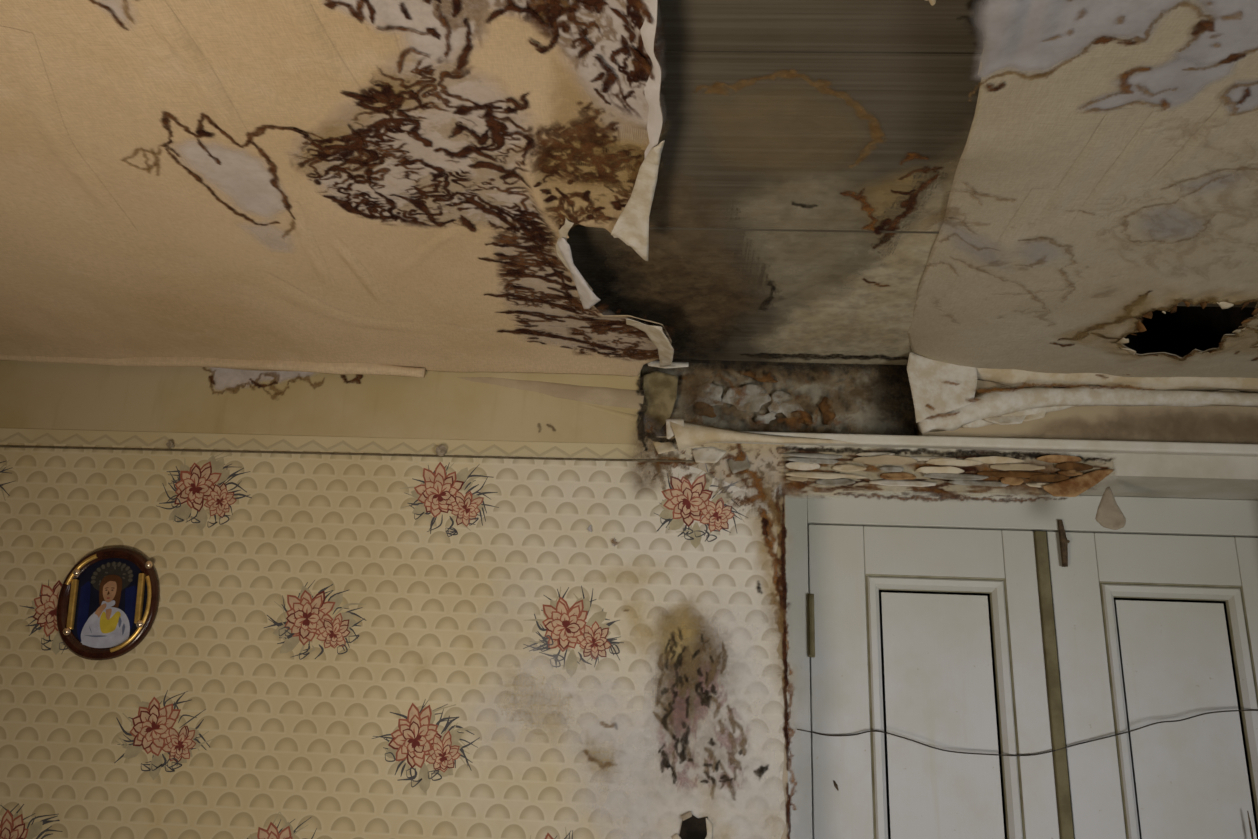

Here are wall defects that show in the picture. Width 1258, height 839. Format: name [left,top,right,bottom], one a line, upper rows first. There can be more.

leakage [121,0,960,549]
peeling [1117,311,1166,355]
peeling [641,360,1114,503]
spalling [672,811,712,839]